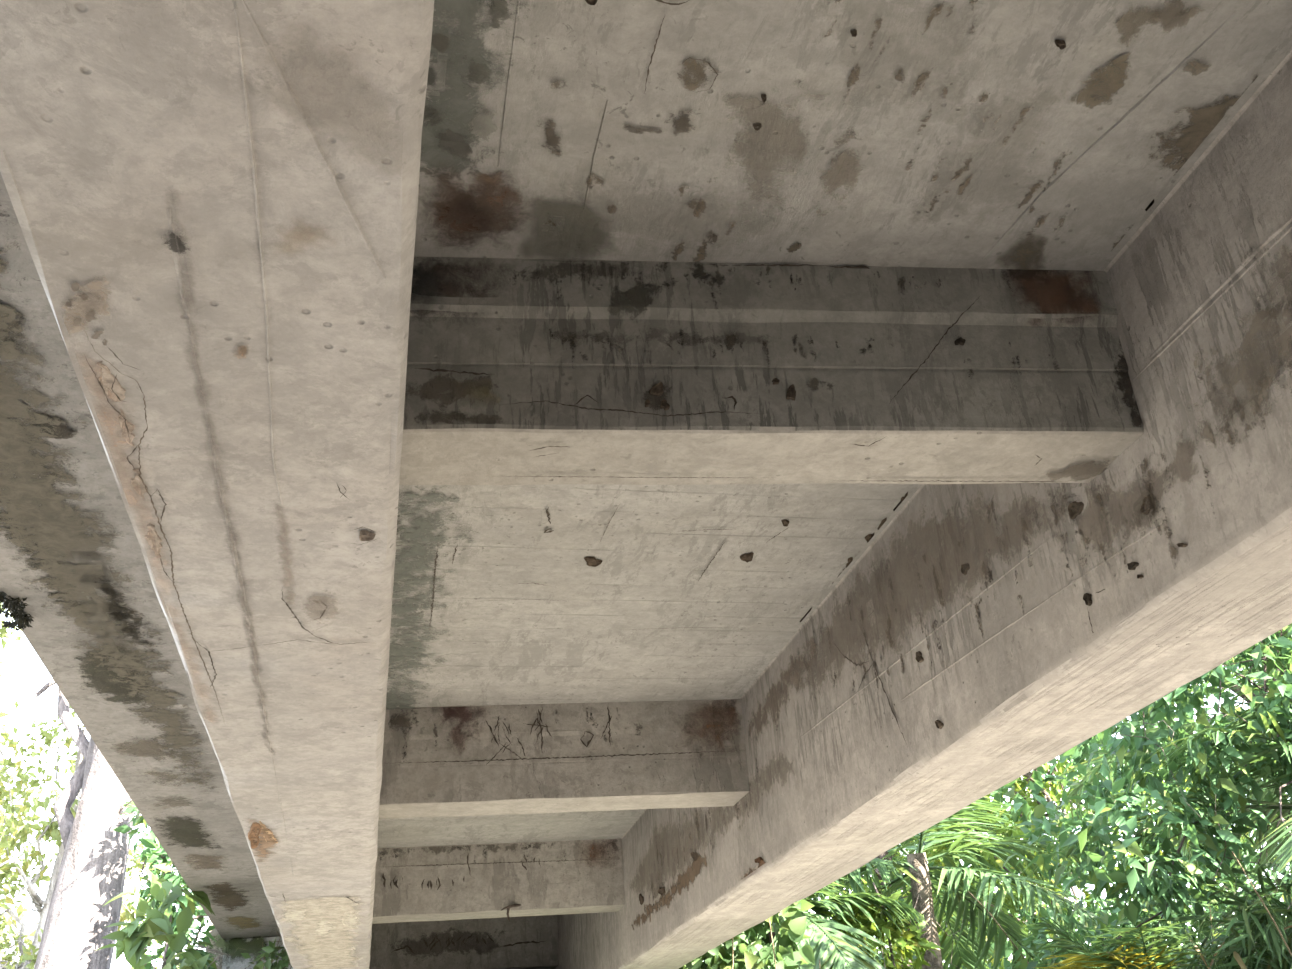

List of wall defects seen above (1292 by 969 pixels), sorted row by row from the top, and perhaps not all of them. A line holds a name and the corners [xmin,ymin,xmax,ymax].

damp [420,0,533,181]
corrosion [432,174,529,246]
peeling [63,280,110,345]
peeling [97,361,135,447]
corrosion [1009,269,1099,325]
damp [1189,245,1292,446]
crack [82,324,365,716]
damp [386,486,478,758]
damp [975,500,1005,634]
damp [1047,461,1109,481]
damp [1096,454,1178,573]
spalling [248,821,278,862]